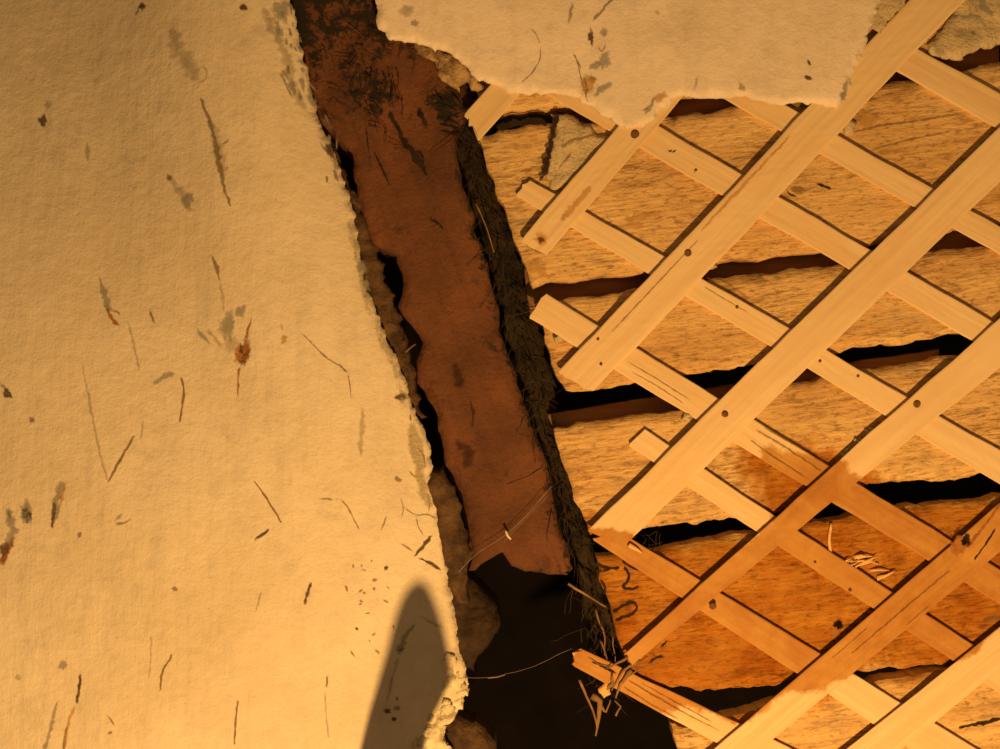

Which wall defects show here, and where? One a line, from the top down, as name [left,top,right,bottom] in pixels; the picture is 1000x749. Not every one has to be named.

spalling [273,4,302,51]
spalling [280,66,317,107]
spalling [574,53,611,95]
spalling [322,115,338,182]
corrosion [235,322,251,394]
spalling [396,415,432,506]
spalling [411,652,470,749]
peeling [598,683,611,698]